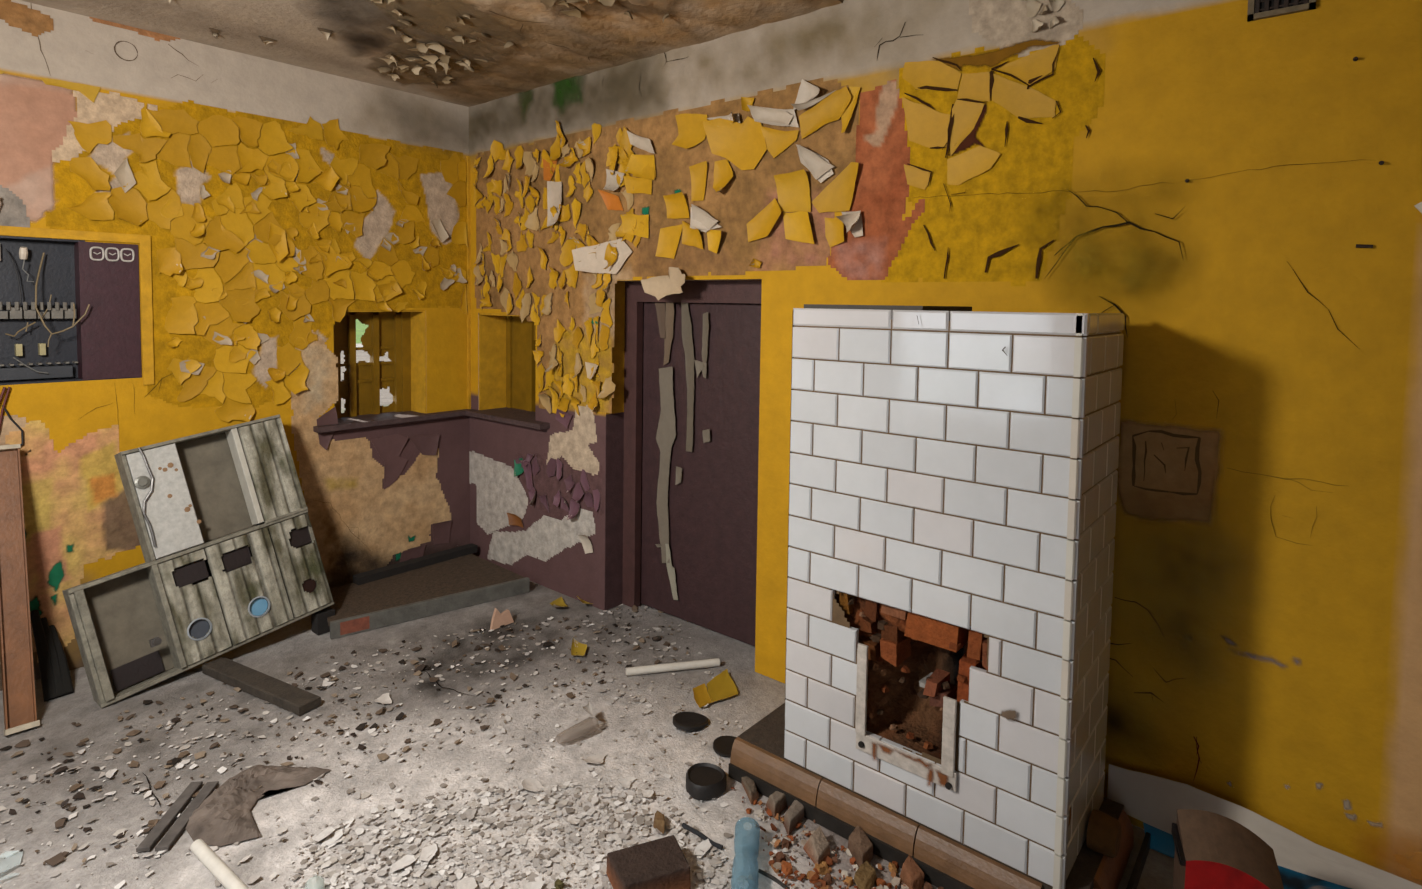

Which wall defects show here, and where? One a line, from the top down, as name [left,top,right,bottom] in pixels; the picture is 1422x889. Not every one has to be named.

spalling [0,0,54,37]
spalling [89,17,180,42]
peeling [540,0,675,22]
peeling [969,0,1083,58]
crack [877,22,1355,286]
peeling [0,70,925,583]
peeling [0,415,140,663]